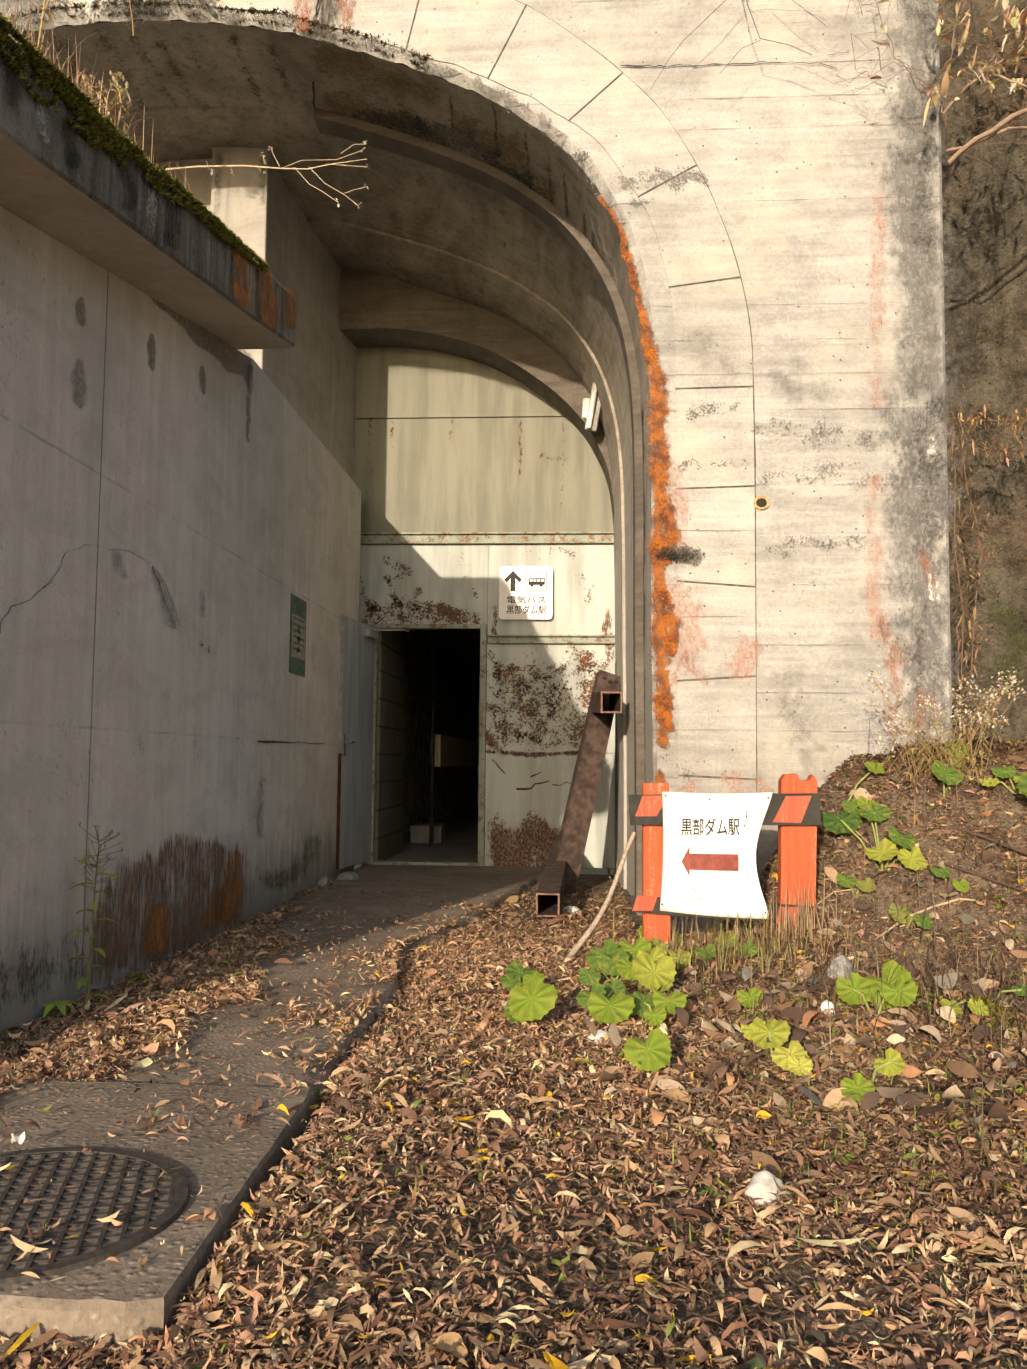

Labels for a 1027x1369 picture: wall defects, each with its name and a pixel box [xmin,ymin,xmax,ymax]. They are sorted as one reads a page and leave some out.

damp [0,0,67,29]
damp [85,0,224,105]
crack [620,52,845,69]
rust [232,250,297,332]
damp [883,0,978,734]
rust [599,196,704,749]
crack [0,544,180,633]
rust [578,610,614,671]
rust [485,730,578,758]
rust [485,811,560,867]
rust [91,833,245,983]